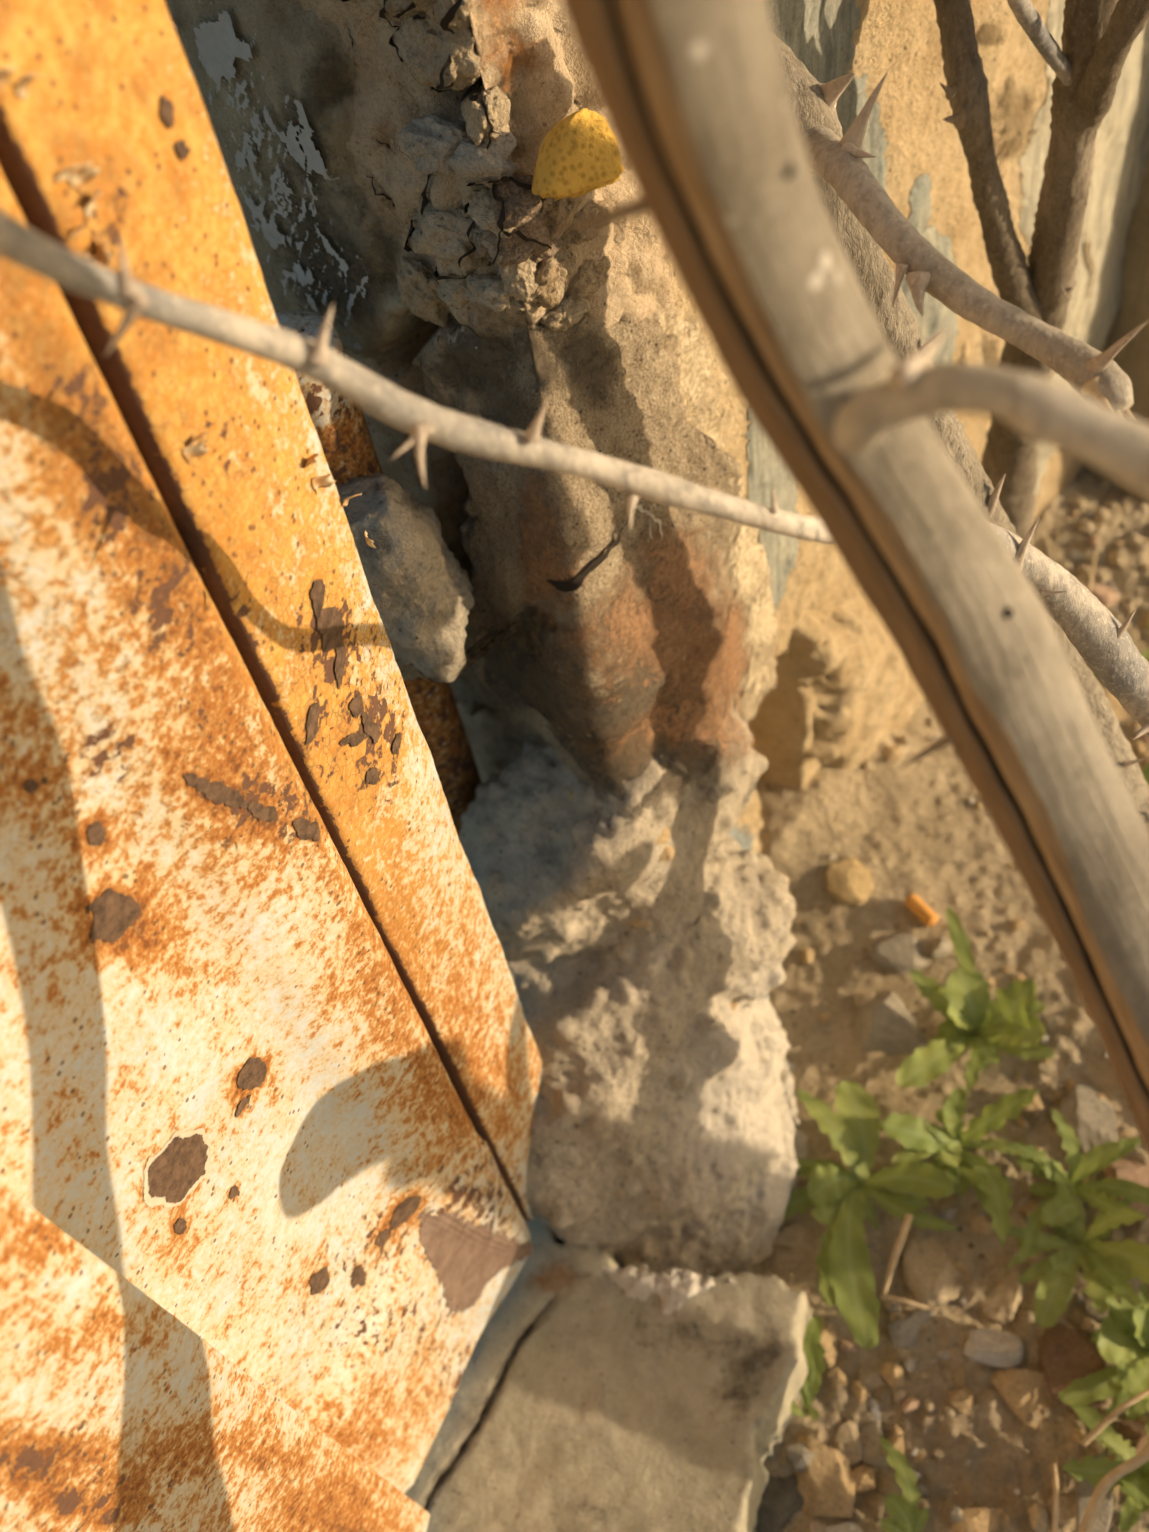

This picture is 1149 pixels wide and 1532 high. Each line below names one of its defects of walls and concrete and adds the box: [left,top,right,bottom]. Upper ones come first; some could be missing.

peeling [172,0,369,329]
crack [341,0,552,280]
crack [424,1296,556,1511]